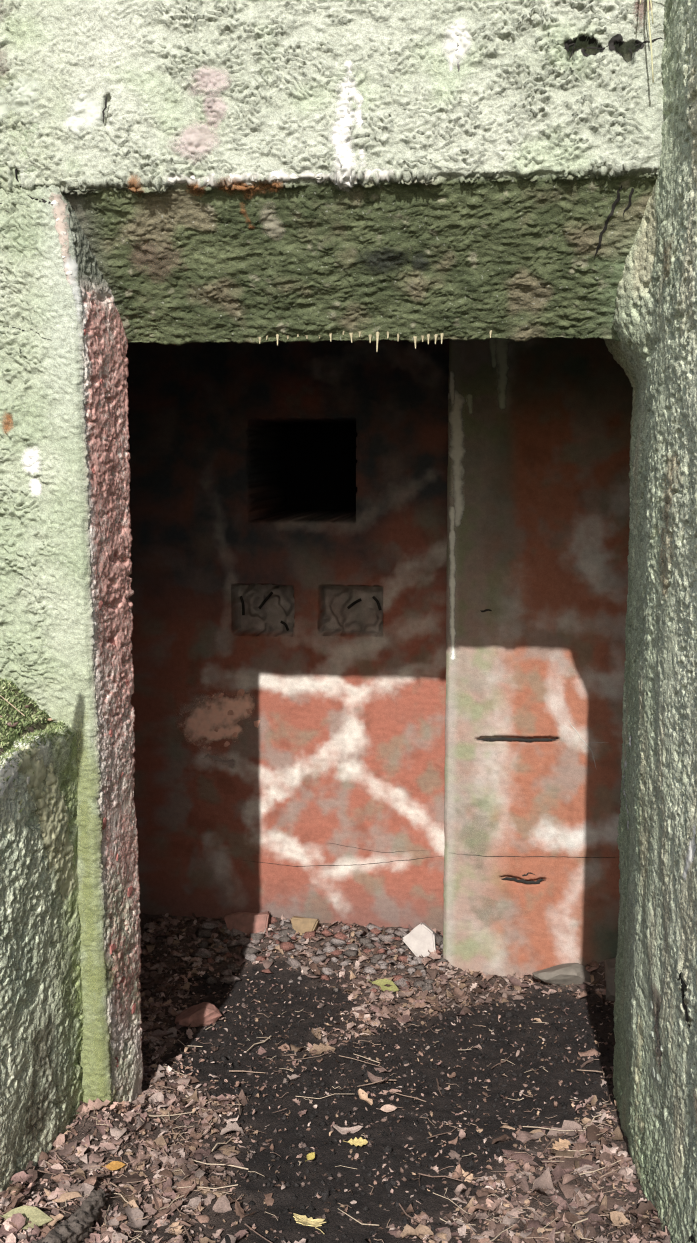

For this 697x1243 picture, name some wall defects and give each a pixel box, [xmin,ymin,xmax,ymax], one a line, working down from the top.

spalling [564,34,663,62]
water stain [333,61,365,188]
rust [219,180,281,229]
crack [594,185,634,258]
water stain [489,337,509,409]
rust [3,414,13,433]
water stain [448,371,472,660]
peeling [83,294,142,1014]
peeling [185,689,260,766]
crack [476,735,558,743]
crack [235,843,615,884]
crack [676,973,690,1028]